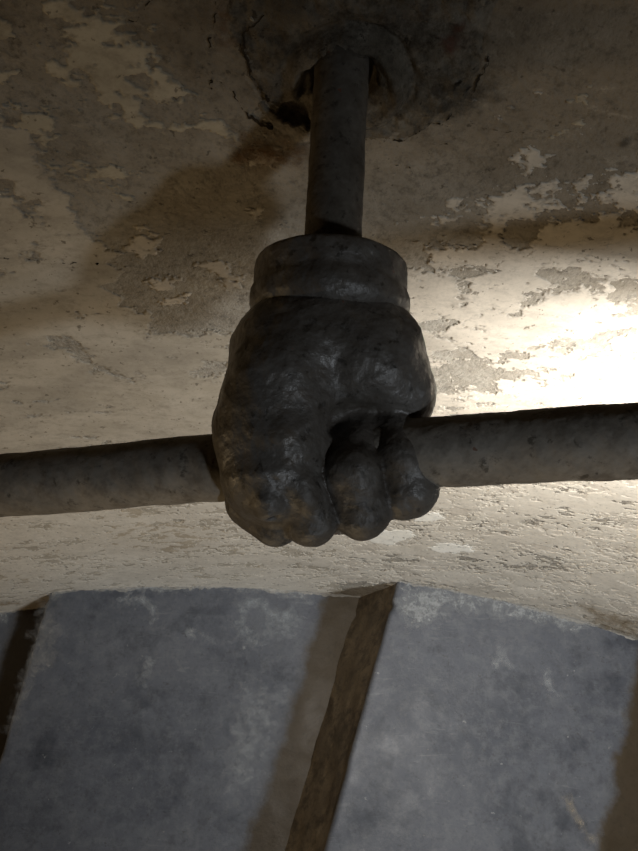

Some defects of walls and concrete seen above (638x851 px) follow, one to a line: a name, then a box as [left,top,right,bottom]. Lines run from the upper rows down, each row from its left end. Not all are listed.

peeling [37,0,281,170]
crack [209,15,311,130]
crack [365,56,489,145]
peeling [0,100,233,454]
peeling [406,144,638,417]